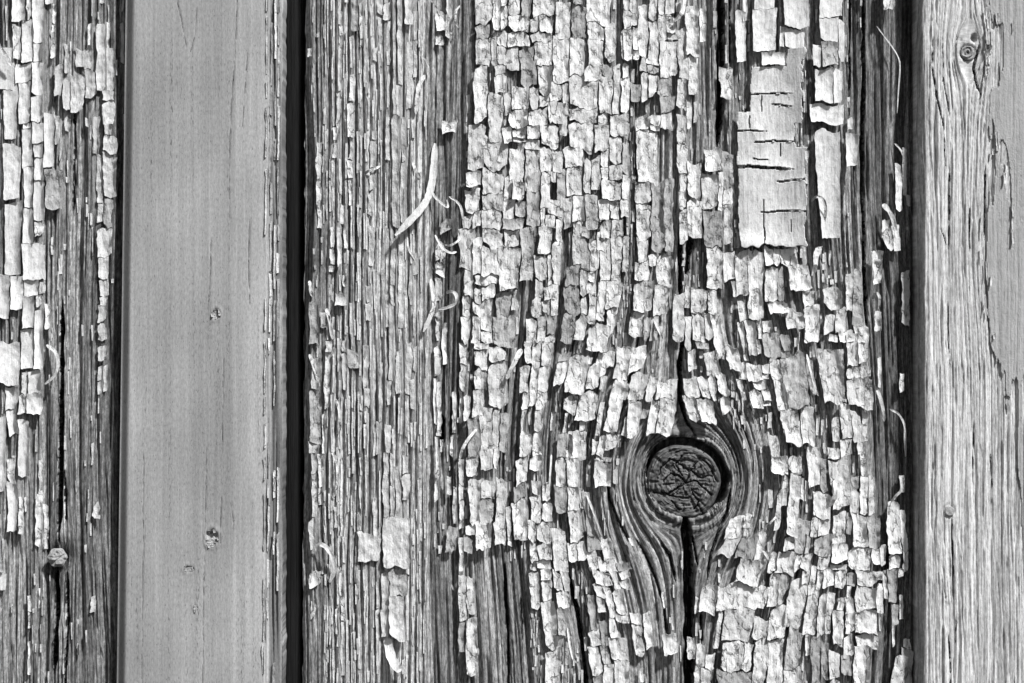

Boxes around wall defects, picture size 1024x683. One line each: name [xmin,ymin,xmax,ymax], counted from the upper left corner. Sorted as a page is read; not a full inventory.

peeling [0,0,124,590]
crack [56,300,68,546]
peeling [307,0,914,683]
peeling [27,574,51,675]
crack [52,571,70,683]
peeling [63,612,87,674]
crack [607,486,731,683]